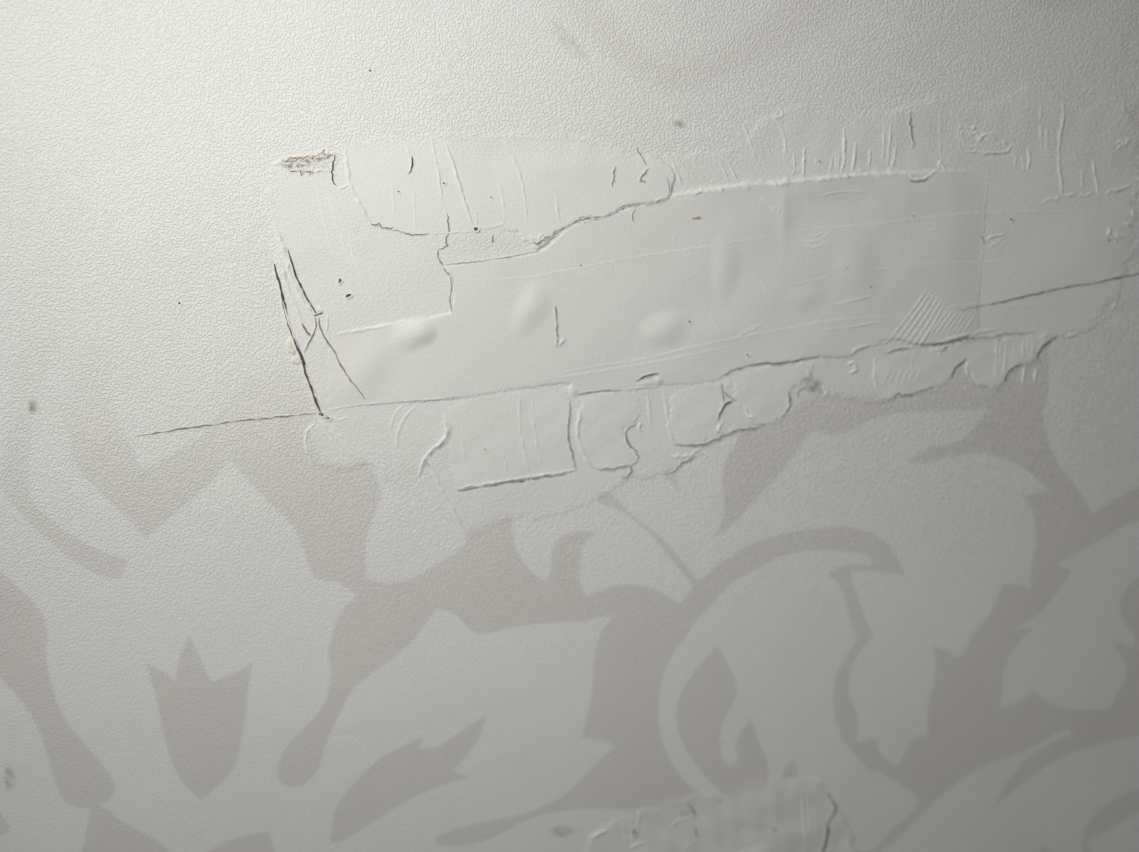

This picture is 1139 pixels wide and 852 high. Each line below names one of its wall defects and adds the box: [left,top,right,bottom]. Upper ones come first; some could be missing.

spalling [269,148,495,243]
spalling [636,147,650,183]
peeling [528,159,947,252]
crack [135,206,448,437]
spalling [337,277,355,300]
crack [428,213,539,319]
spalling [554,306,566,348]
peeling [846,301,1118,384]
crack [960,272,1139,311]
peeling [444,372,664,489]
spalling [666,353,819,475]